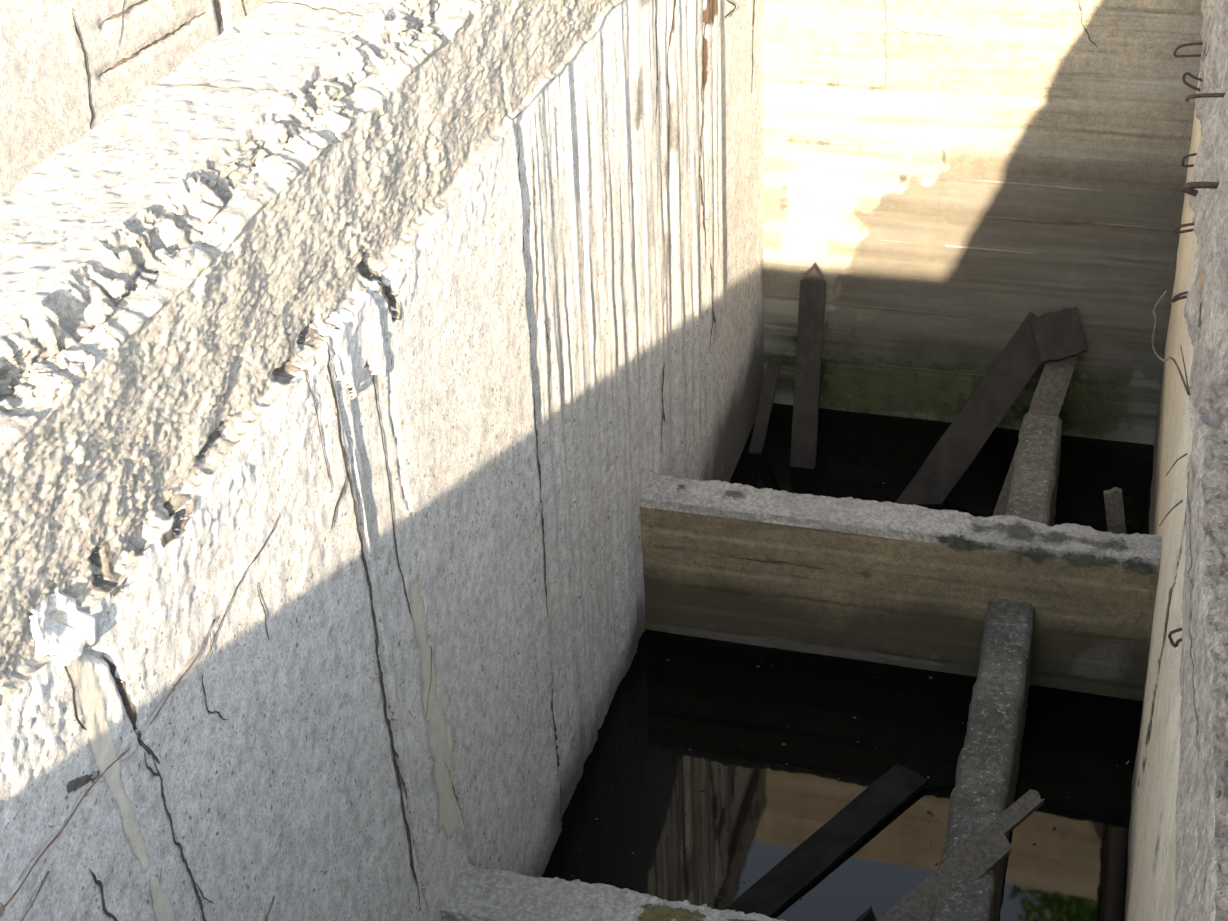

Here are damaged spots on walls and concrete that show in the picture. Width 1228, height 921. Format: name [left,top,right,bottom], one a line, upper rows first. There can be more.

crack [72,12,93,129]
rust [702,0,718,87]
crack [884,0,957,95]
spalling [0,0,447,413]
rust [1197,271,1205,339]
spalling [195,416,231,461]
spalling [89,544,128,597]
spalling [159,490,195,548]
crack [202,513,280,720]
crack [282,318,421,911]
crack [373,375,437,716]
flaking render [29,591,175,921]